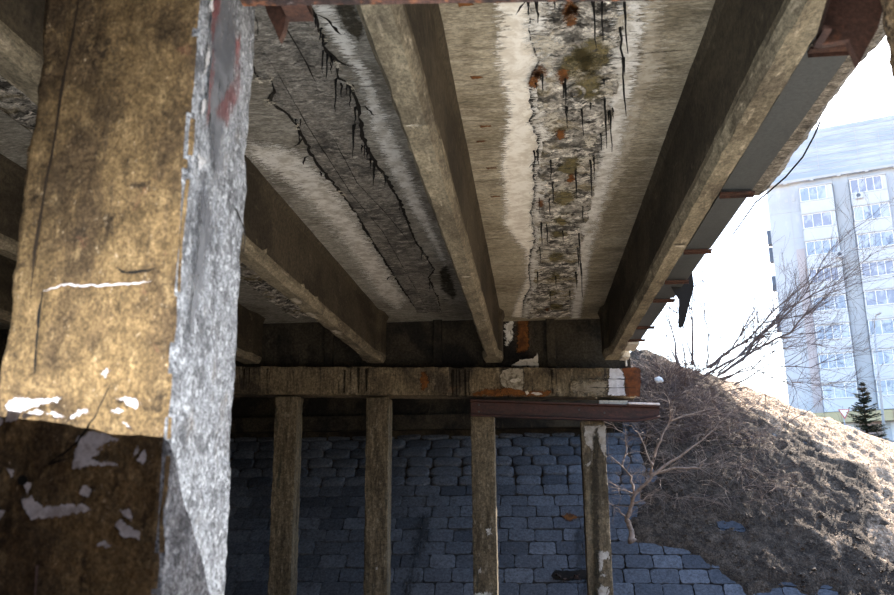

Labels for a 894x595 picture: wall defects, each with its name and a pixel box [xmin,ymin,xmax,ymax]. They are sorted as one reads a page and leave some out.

water stain [587,0,670,265]
crack [311,5,448,312]
spalling [521,1,653,319]
crack [253,65,419,314]
corrosion [622,367,641,397]
peeling [0,397,89,426]
peeling [111,396,141,431]
peeling [72,431,119,470]
peeling [133,446,147,464]
peeling [22,482,91,520]
peeling [115,508,140,540]